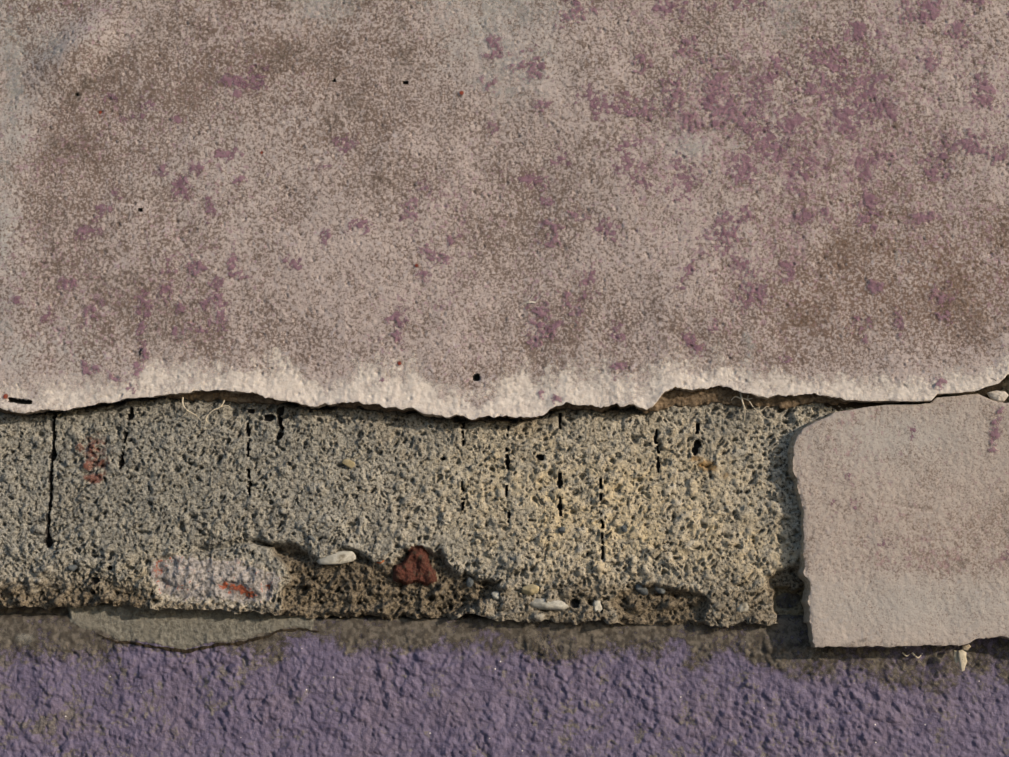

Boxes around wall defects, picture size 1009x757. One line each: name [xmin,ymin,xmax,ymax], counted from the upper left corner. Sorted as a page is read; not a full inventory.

peeling [344,213,376,235]
peeling [676,205,773,314]
crack [824,378,1003,416]
crack [8,397,60,547]
spalling [0,253,1009,694]